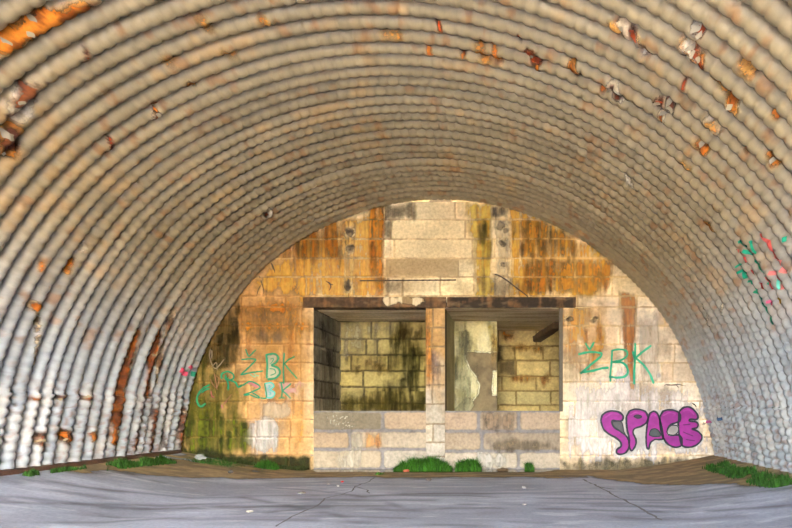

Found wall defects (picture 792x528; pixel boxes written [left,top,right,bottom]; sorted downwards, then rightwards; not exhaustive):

corrosion [0,0,91,55]
peeling [616,17,650,54]
peeling [679,37,705,66]
corrosion [242,207,384,356]
corrosion [509,209,611,296]
corrosion [619,292,636,398]
corrosion [110,329,140,445]
corrosion [132,308,176,452]
peeling [455,351,497,411]
corrosion [32,432,47,448]
corrosion [57,428,72,445]
crack [276,478,374,527]